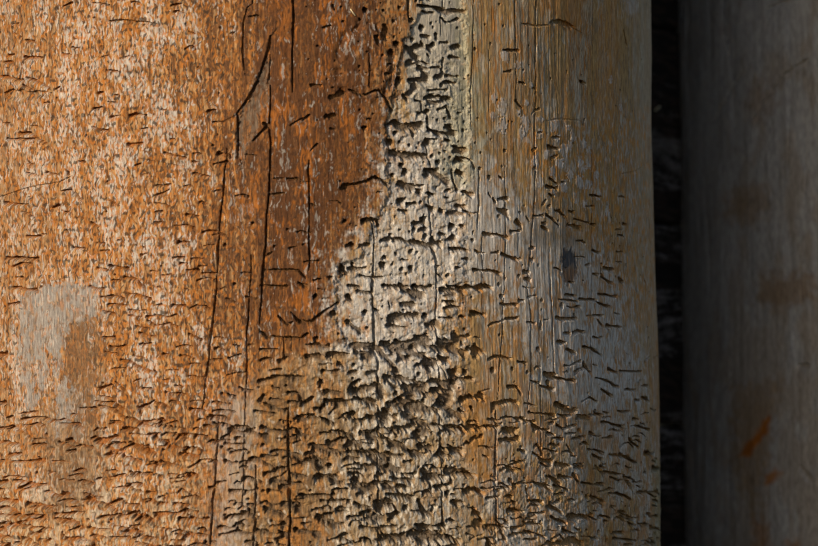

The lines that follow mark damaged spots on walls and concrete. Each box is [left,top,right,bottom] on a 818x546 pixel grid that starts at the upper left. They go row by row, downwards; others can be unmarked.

crack [289,0,297,92]
crack [370,220,381,546]